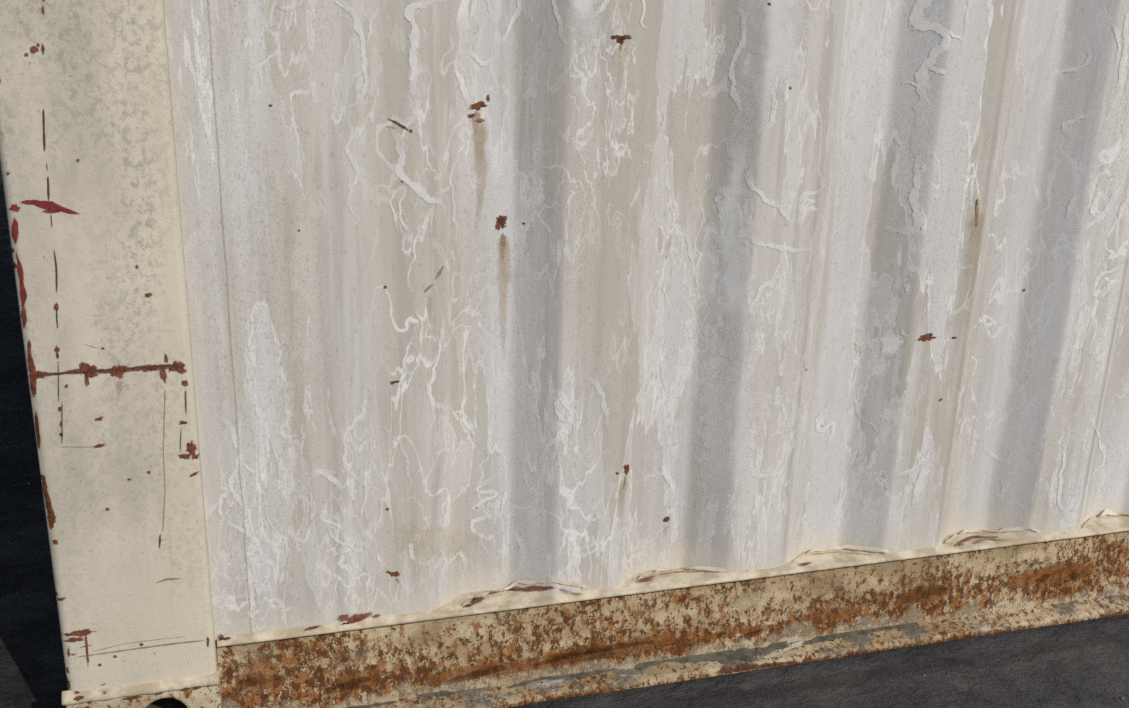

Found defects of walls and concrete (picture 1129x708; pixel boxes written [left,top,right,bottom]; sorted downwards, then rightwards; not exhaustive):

rust [468,95,490,151]
rust [495,215,509,230]
rust [1009,562,1095,588]
rust [706,624,779,640]
rust [227,668,273,701]
rust [325,657,392,693]